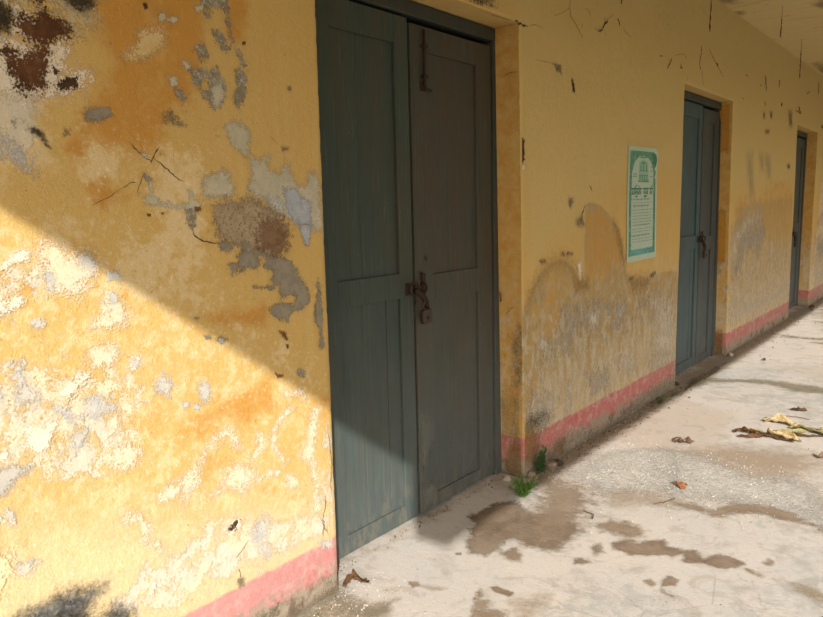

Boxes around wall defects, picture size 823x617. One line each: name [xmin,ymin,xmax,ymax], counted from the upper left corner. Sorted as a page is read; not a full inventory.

leakage [0,1,14,34]
peeling [0,0,114,124]
leakage [65,0,95,12]
peeling [166,0,248,112]
crack [95,146,219,244]
peeling [200,117,326,350]
peeling [0,234,145,497]
peeling [182,381,212,410]
peeling [155,386,324,521]
spalling [225,515,242,538]
leakage [16,584,104,617]
leakage [109,604,129,617]